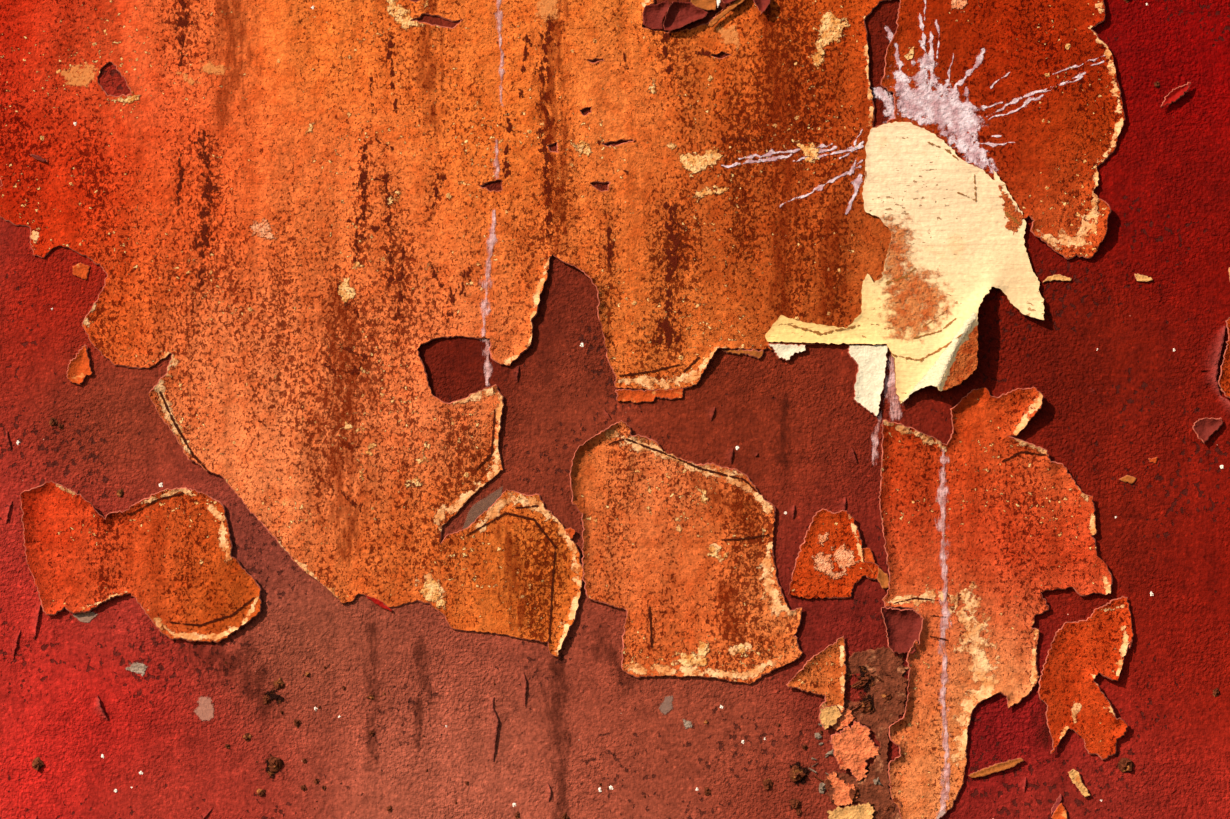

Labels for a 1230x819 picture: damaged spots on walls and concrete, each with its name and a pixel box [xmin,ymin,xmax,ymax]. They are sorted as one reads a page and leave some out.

corrosion [174,0,193,66]
corrosion [176,131,221,288]
corrosion [346,138,408,321]
corrosion [383,36,398,113]
corrosion [431,265,472,323]
corrosion [499,112,516,179]
corrosion [518,13,564,238]
peeling [0,0,1126,685]
corrosion [603,218,615,267]
corrosion [650,200,694,350]
peeling [1218,317,1230,398]
peeling [786,387,1136,819]